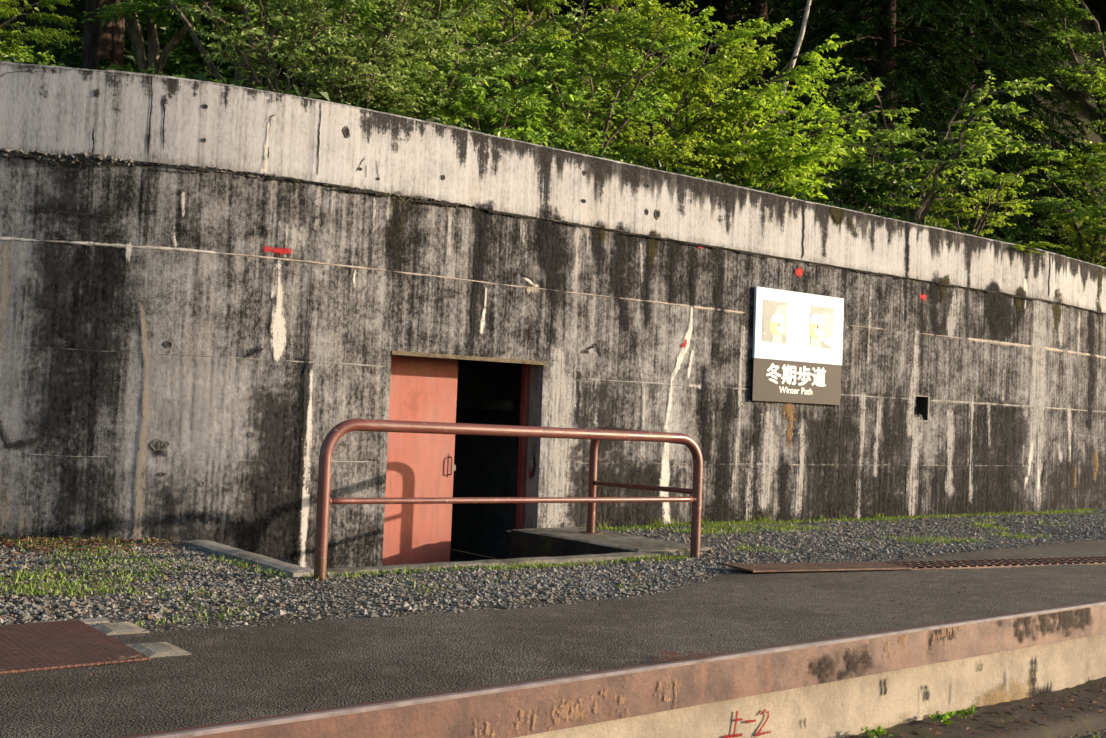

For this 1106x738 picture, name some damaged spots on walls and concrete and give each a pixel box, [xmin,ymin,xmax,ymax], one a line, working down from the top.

crack [0,412,47,450]
leakage [0,109,1106,568]